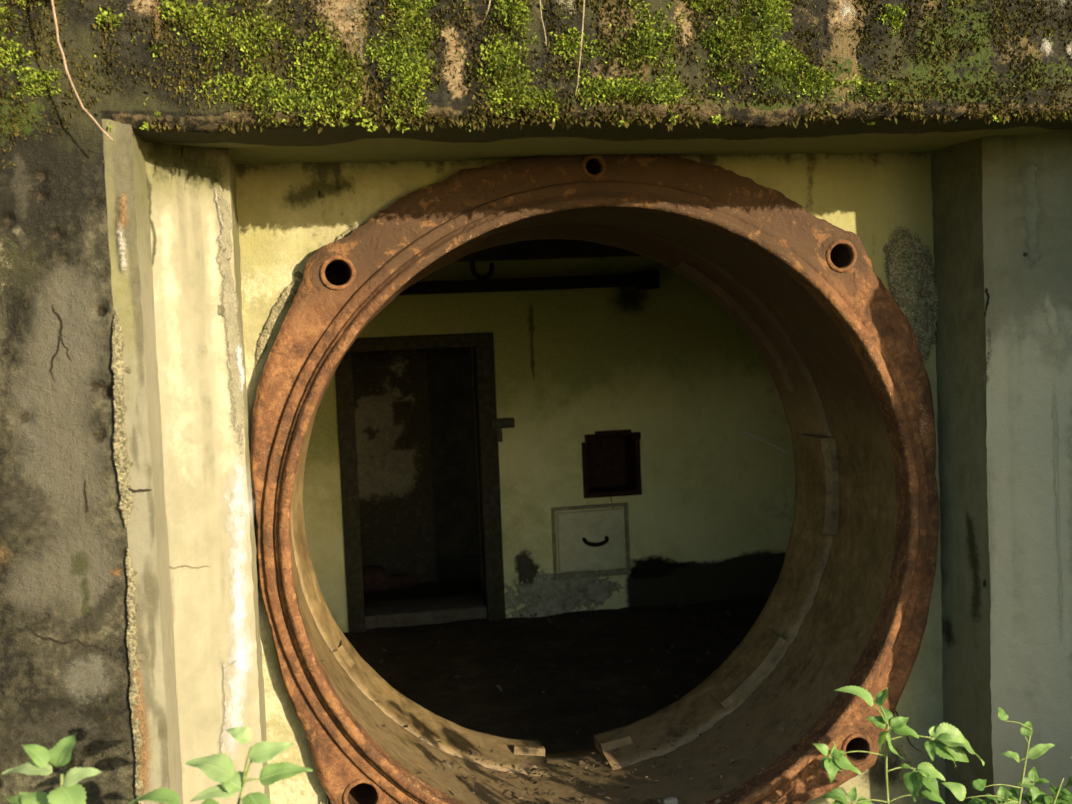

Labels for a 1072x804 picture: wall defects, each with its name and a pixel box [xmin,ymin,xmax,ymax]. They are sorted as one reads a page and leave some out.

damp [6,152,33,253]
crack [49,304,72,380]
spalling [883,225,938,363]
damp [75,557,123,629]
damp [220,468,250,754]
peeling [504,550,621,618]
spalling [125,548,145,804]
damp [4,702,110,754]